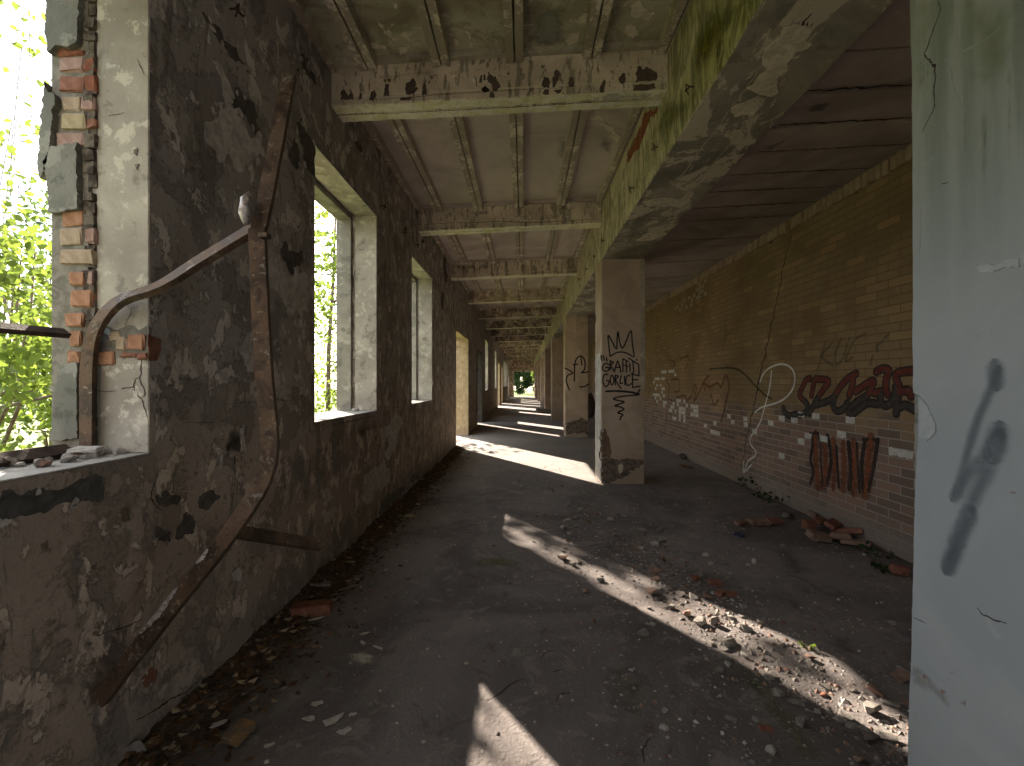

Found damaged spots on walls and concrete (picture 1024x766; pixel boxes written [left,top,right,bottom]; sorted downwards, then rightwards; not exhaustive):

damp [600,66,658,99]
crack [922,1,941,132]
flaking render [37,0,99,448]
crack [742,230,792,468]
crack [98,360,147,416]
spalling [566,417,644,484]
spalling [0,474,105,527]
peeling [155,490,220,542]